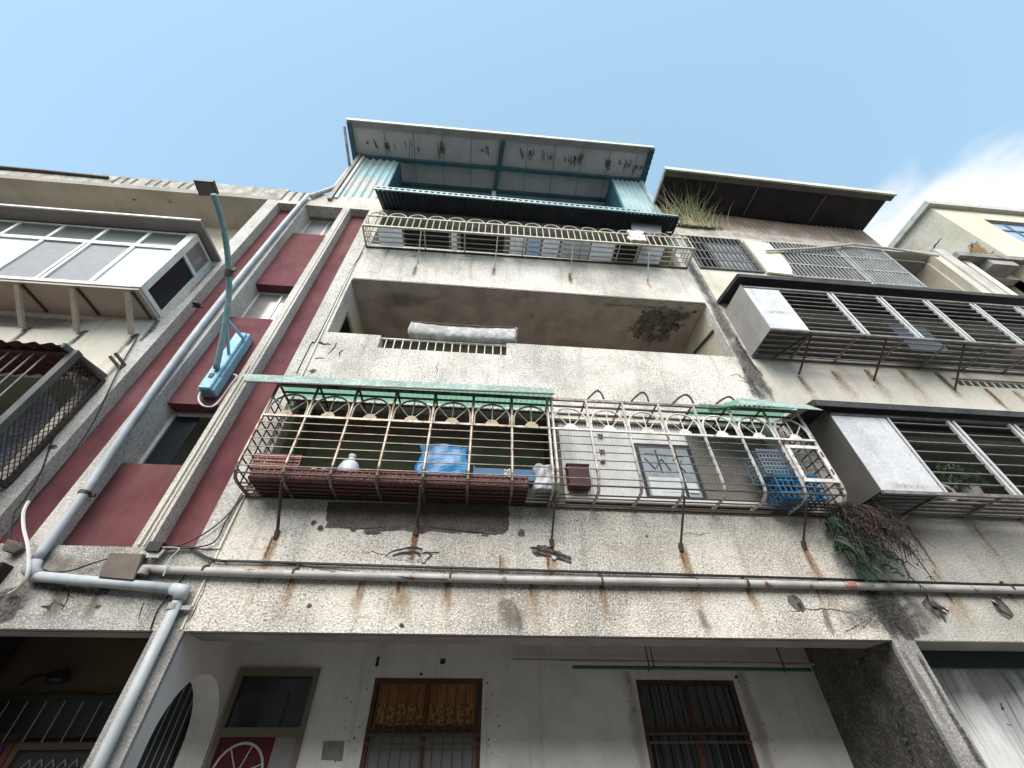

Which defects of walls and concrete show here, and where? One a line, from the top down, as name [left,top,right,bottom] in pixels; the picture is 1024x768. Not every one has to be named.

peeling [311,502,572,563]
spalling [787,594,806,612]
water stain [846,590,931,639]
spalling [921,595,949,622]
spalling [991,596,1014,619]